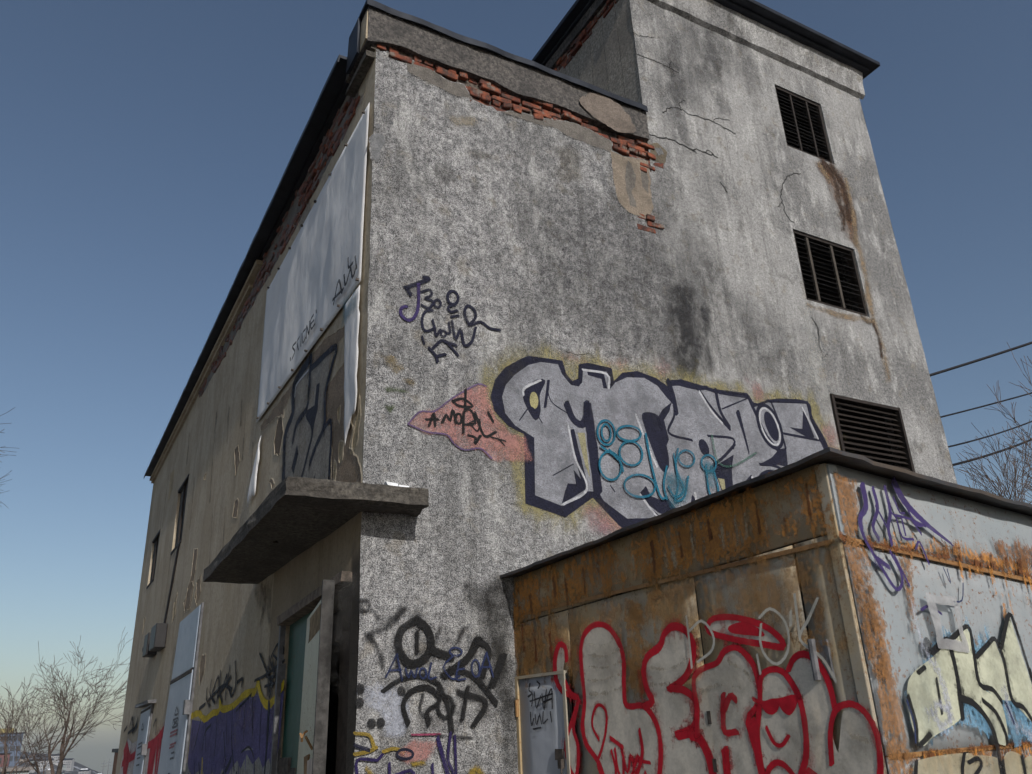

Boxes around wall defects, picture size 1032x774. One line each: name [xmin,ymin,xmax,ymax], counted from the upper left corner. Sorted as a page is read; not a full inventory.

flaking render [198,87,367,398]
flaking render [375,44,668,234]
crack [649,100,736,192]
crack [778,173,801,223]
rust [818,159,890,378]
rust [513,469,1032,774]